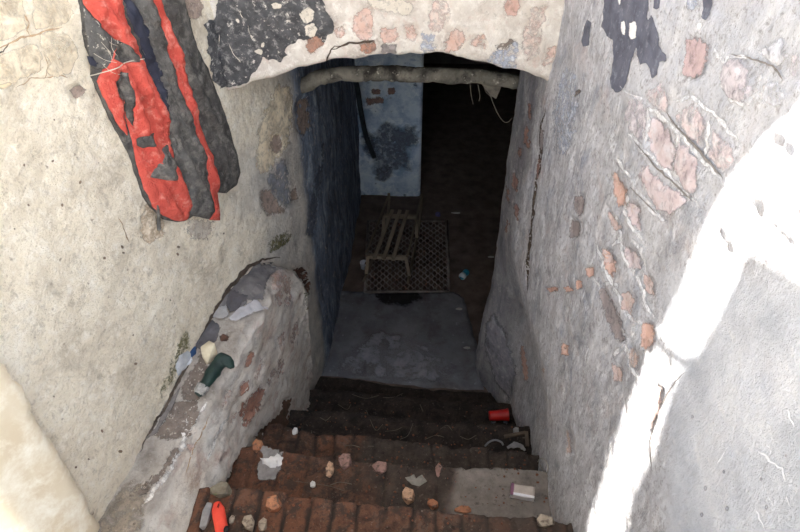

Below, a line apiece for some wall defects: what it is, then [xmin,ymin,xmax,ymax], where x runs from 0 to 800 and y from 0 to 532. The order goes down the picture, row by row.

spalling [299,7,324,54]
spalling [334,8,417,54]
spalling [428,0,486,53]
spalling [504,0,520,16]
spalling [522,7,556,66]
flaking render [682,38,797,106]
crack [526,113,545,290]
flaking render [569,196,585,238]
flaking render [593,85,738,381]
flaking render [224,351,284,427]